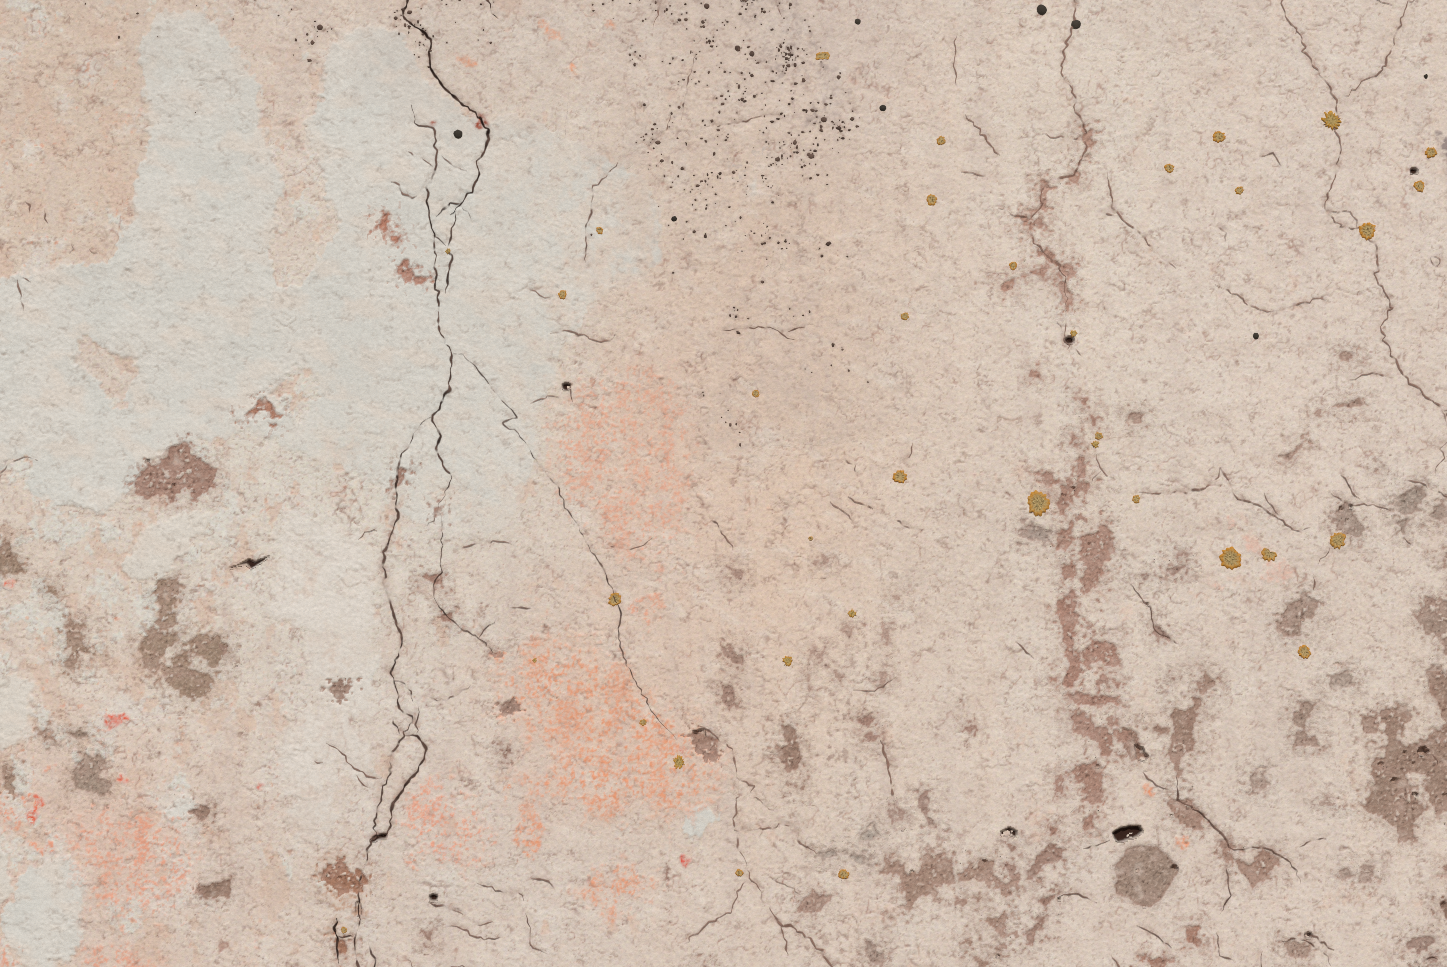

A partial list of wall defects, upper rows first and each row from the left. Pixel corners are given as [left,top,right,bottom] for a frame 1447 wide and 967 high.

spalling [186,867,245,912]
peeling [0,49,640,542]
spalling [306,850,384,906]
crack [315,0,573,967]
leakage [0,0,1034,472]
crack [558,487,833,967]
spalling [675,356,1293,967]
spalling [986,115,1107,327]
crack [1000,8,1175,355]
crack [1092,456,1330,590]
spalling [1235,454,1447,967]
crack [1281,0,1447,497]